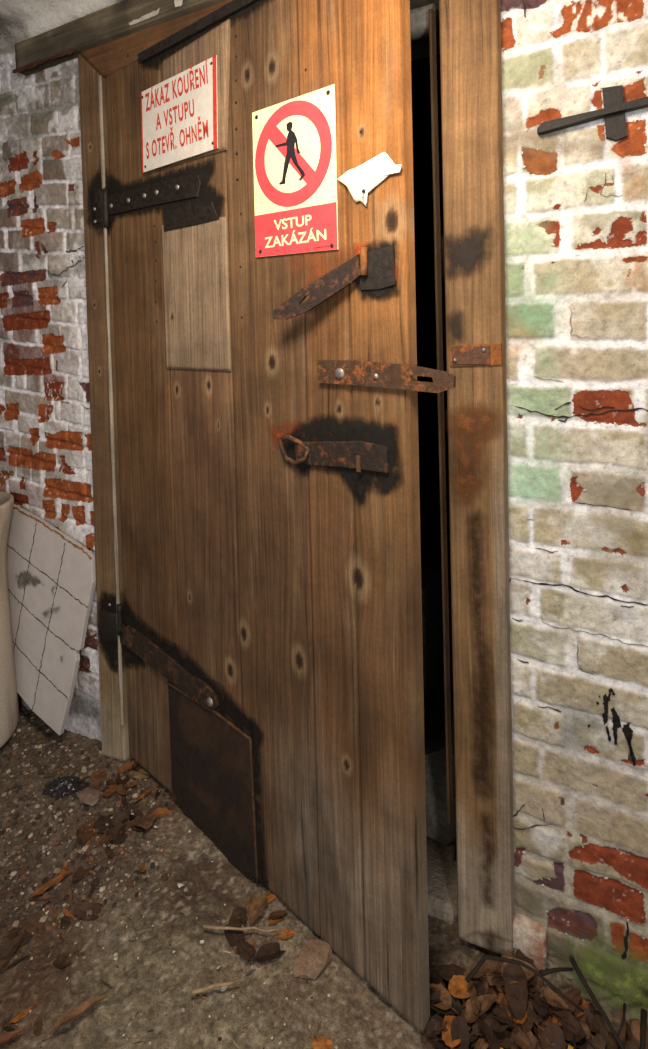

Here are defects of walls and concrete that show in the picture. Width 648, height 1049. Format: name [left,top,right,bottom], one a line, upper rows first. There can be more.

peeling [500,0,547,53]
peeling [549,0,644,38]
peeling [596,118,648,158]
peeling [521,146,558,177]
peeling [538,204,561,247]
peeling [575,211,648,277]
peeling [0,150,95,553]
crack [508,376,648,422]
peeling [571,388,647,427]
crack [509,578,648,608]
crack [513,617,647,676]
peeling [533,829,648,963]